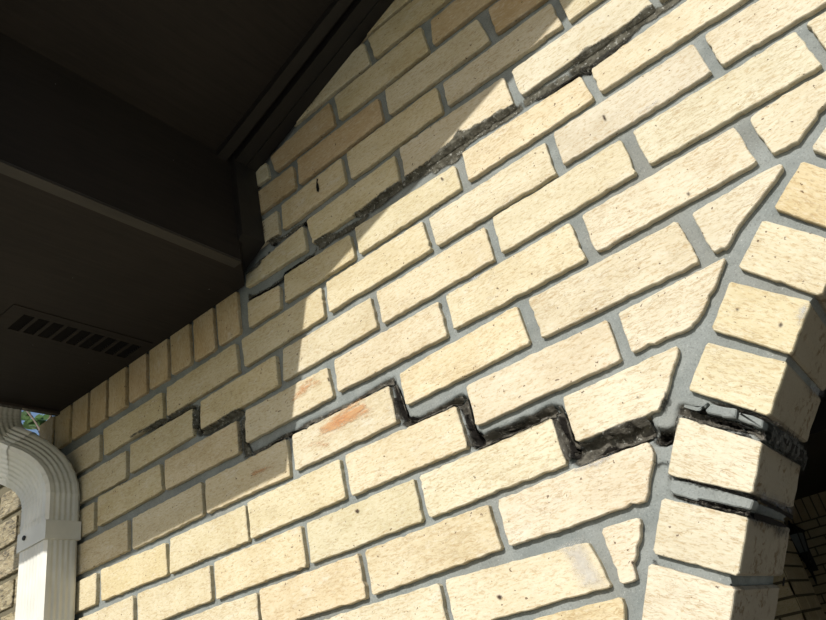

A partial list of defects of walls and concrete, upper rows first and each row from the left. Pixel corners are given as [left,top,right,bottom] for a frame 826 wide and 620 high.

crack [246,0,679,301]
crack [130,378,808,527]